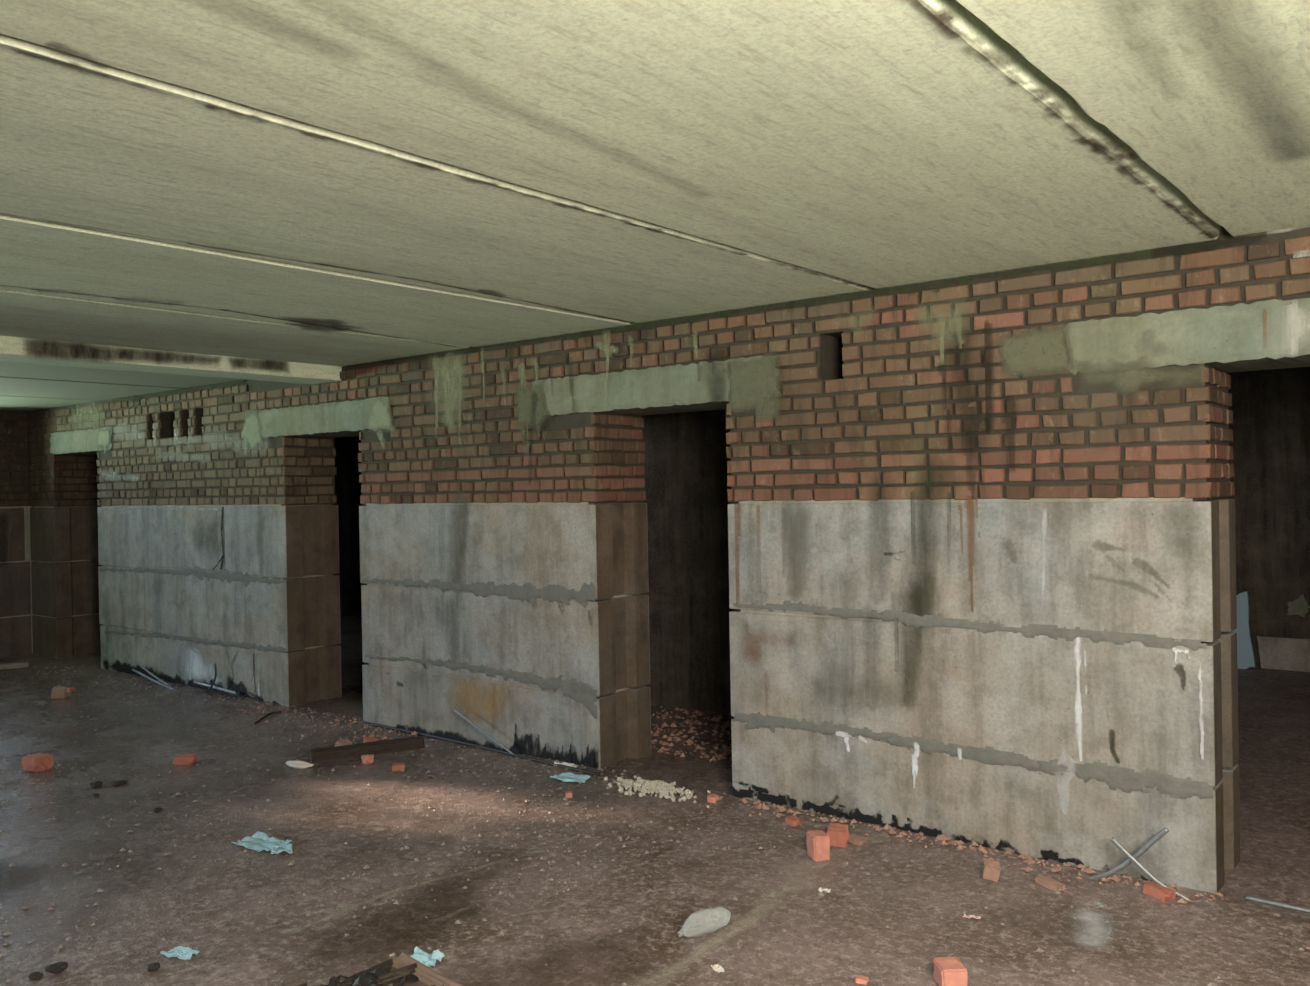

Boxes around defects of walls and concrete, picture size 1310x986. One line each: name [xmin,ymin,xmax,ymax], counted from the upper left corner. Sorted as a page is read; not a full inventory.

corrosion [967,497,979,611]
damp [836,731,868,752]
damp [911,742,920,788]
damp [1074,637,1087,761]
damp [1110,730,1120,763]
damp [1172,648,1204,760]